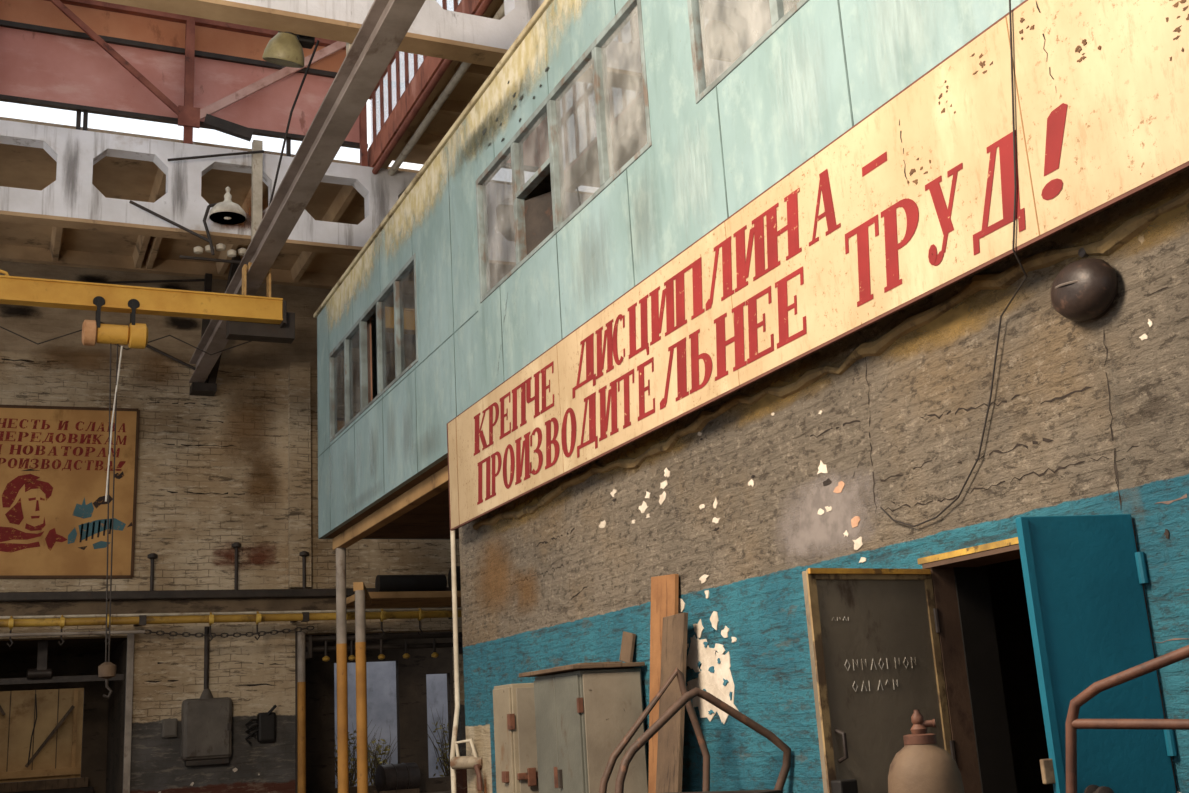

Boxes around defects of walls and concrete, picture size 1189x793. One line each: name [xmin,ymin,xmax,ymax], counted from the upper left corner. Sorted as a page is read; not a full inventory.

damp [326,0,581,327]
peeling [631,468,670,524]
peeling [699,498,720,531]
flaking render [817,460,845,493]
flaking render [843,516,867,563]
peeling [687,574,738,724]